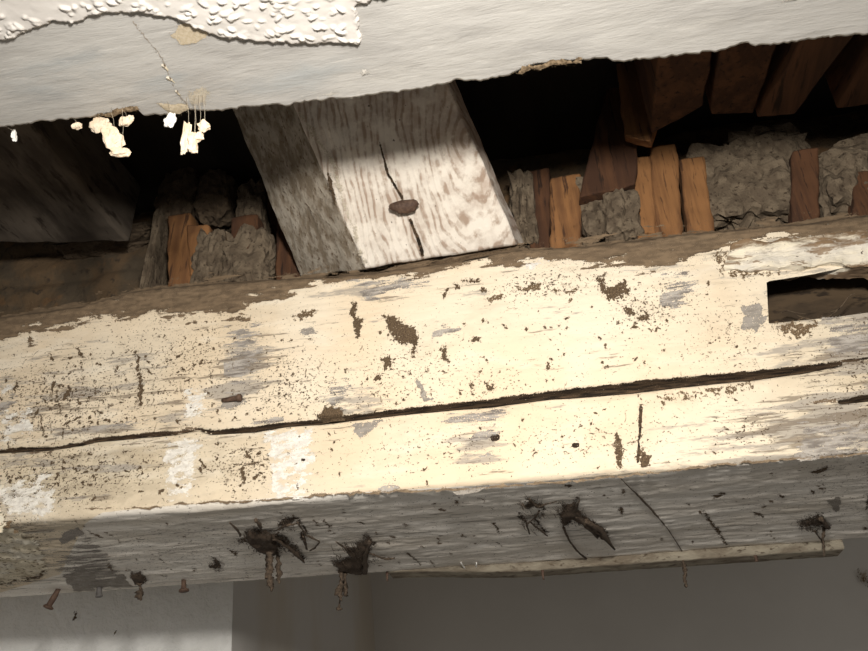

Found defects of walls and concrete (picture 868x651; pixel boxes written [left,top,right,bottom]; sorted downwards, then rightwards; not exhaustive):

peeling [0,0,371,47]
spalling [516,57,582,74]
peeling [71,106,139,157]
peeling [157,96,210,155]
crack [379,142,403,199]
crack [409,218,424,256]
peeling [346,275,430,301]
peeling [616,264,710,334]
peeling [740,302,768,334]
crack [0,354,868,538]
peeling [794,412,868,462]
spalling [0,510,132,593]